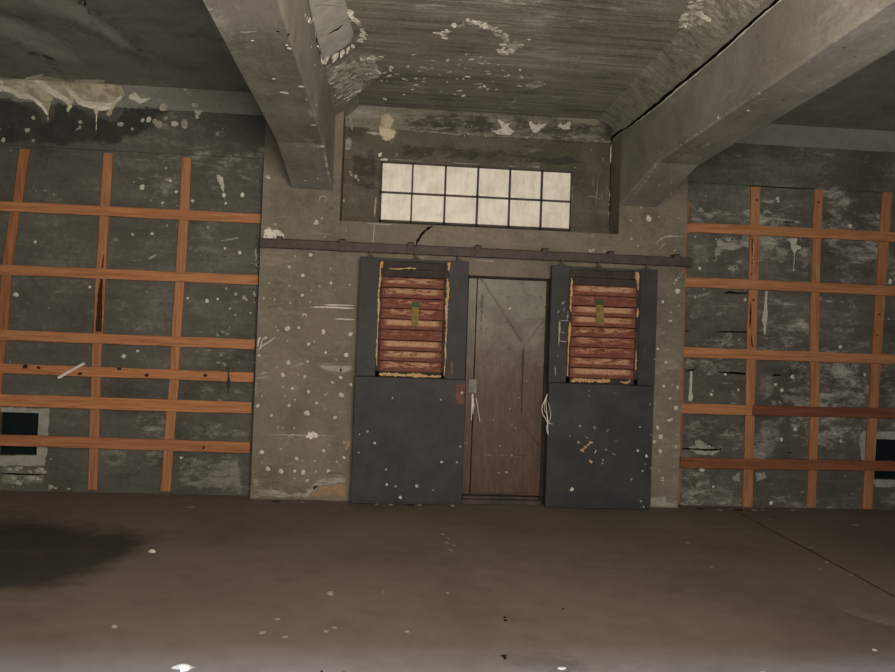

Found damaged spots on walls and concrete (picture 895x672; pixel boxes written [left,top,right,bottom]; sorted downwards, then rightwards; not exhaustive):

damp [0,0,193,148]
peeling [305,10,531,103]
damp [350,100,617,192]
damp [788,238,801,271]